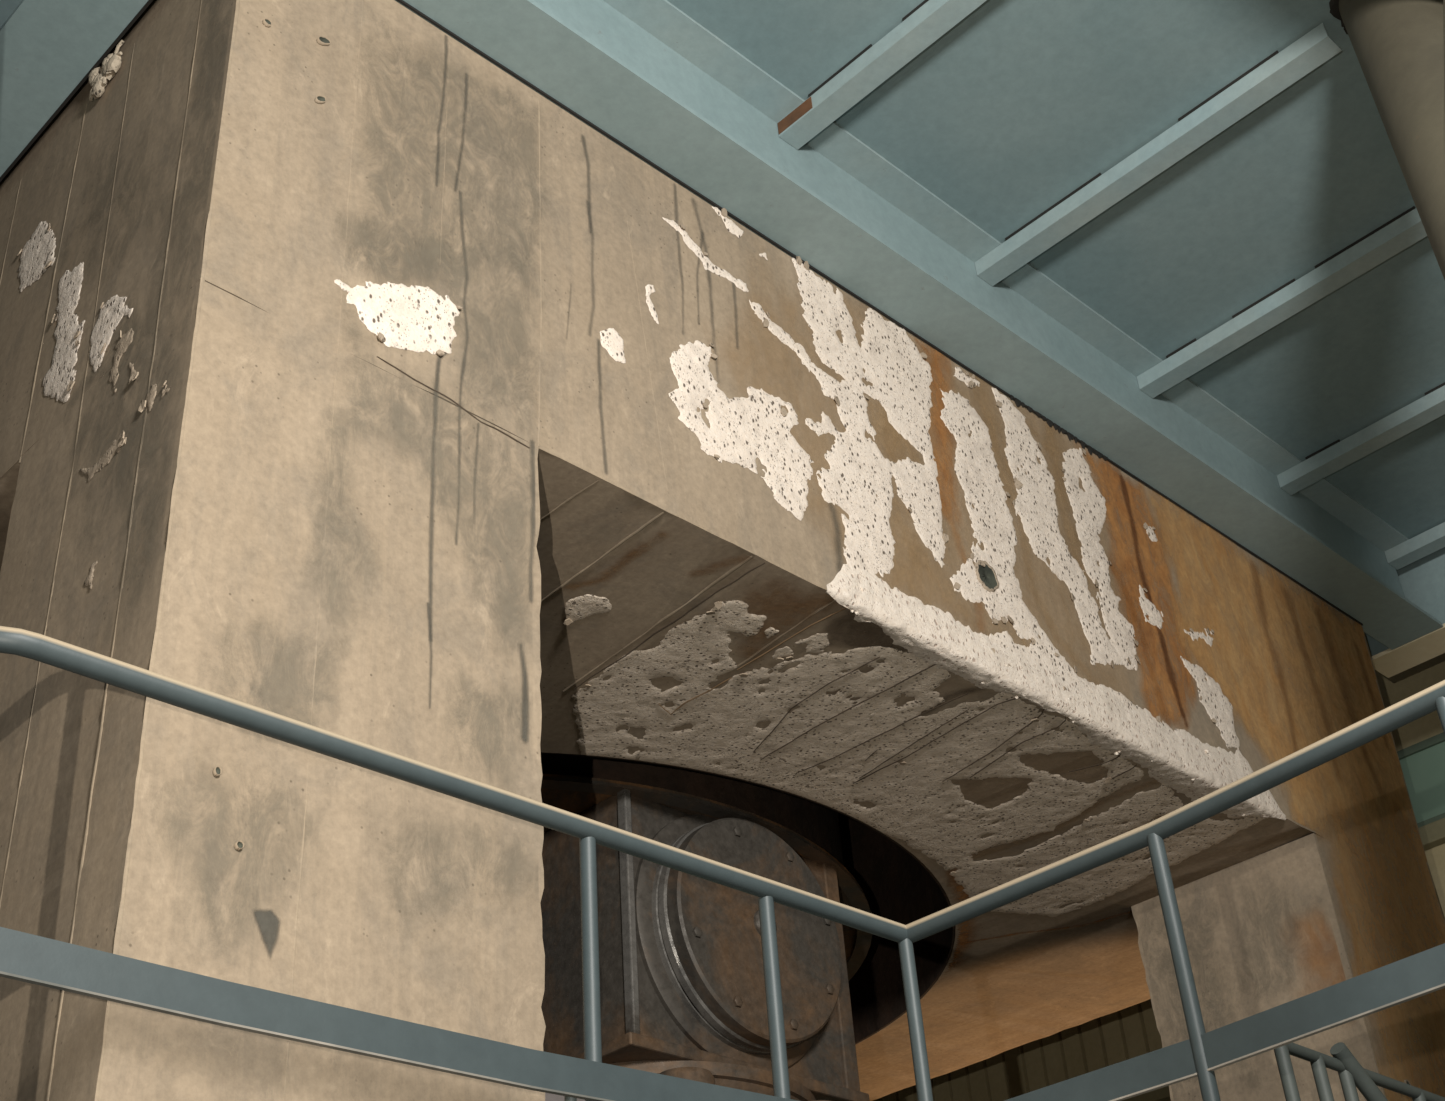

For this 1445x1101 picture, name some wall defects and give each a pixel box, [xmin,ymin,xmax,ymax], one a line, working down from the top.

peeling [712,206,744,238]
peeling [16,221,171,413]
peeling [334,279,462,356]
peeling [79,431,127,482]
crack [377,356,530,448]
peeling [564,217,1253,898]
rust [1086,454,1384,762]
crack [754,657,1066,784]
crack [1069,754,1137,779]
peeling [990,790,1286,917]
rust [1286,733,1445,975]
rust [1378,988,1445,1101]